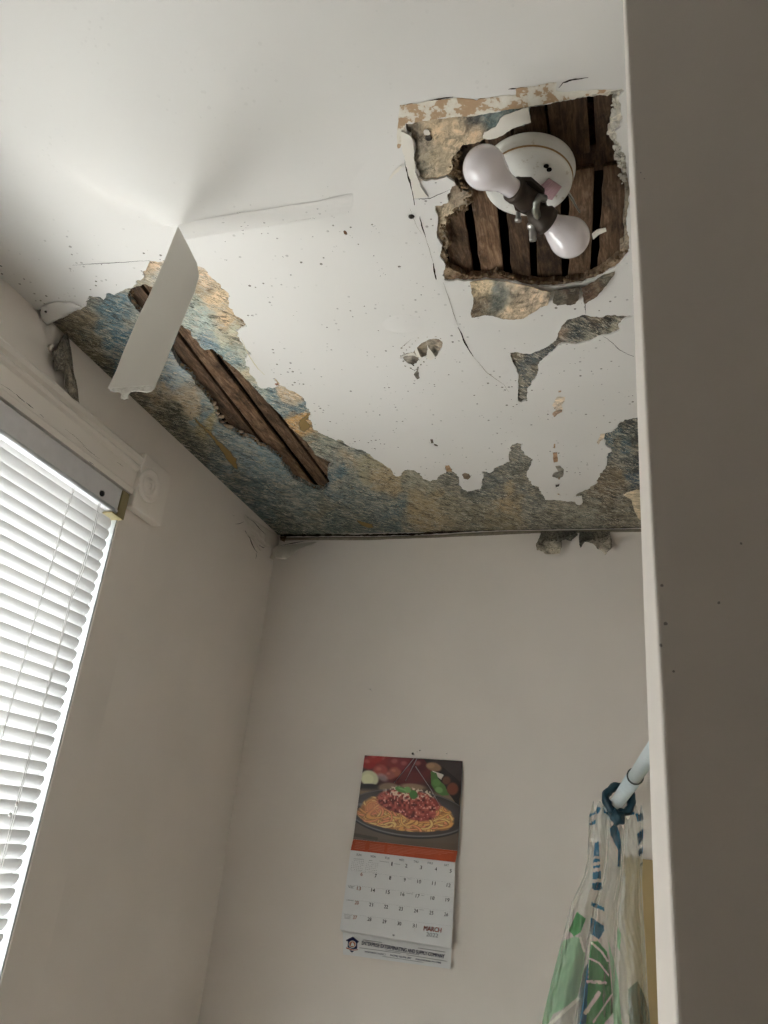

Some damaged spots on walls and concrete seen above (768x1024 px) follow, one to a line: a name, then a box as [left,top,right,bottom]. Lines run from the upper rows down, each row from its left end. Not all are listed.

peeling [39,260,164,402]
water stain [299,413,310,432]
peeling [129,266,641,560]
crack [405,165,509,392]
spalling [397,82,631,401]